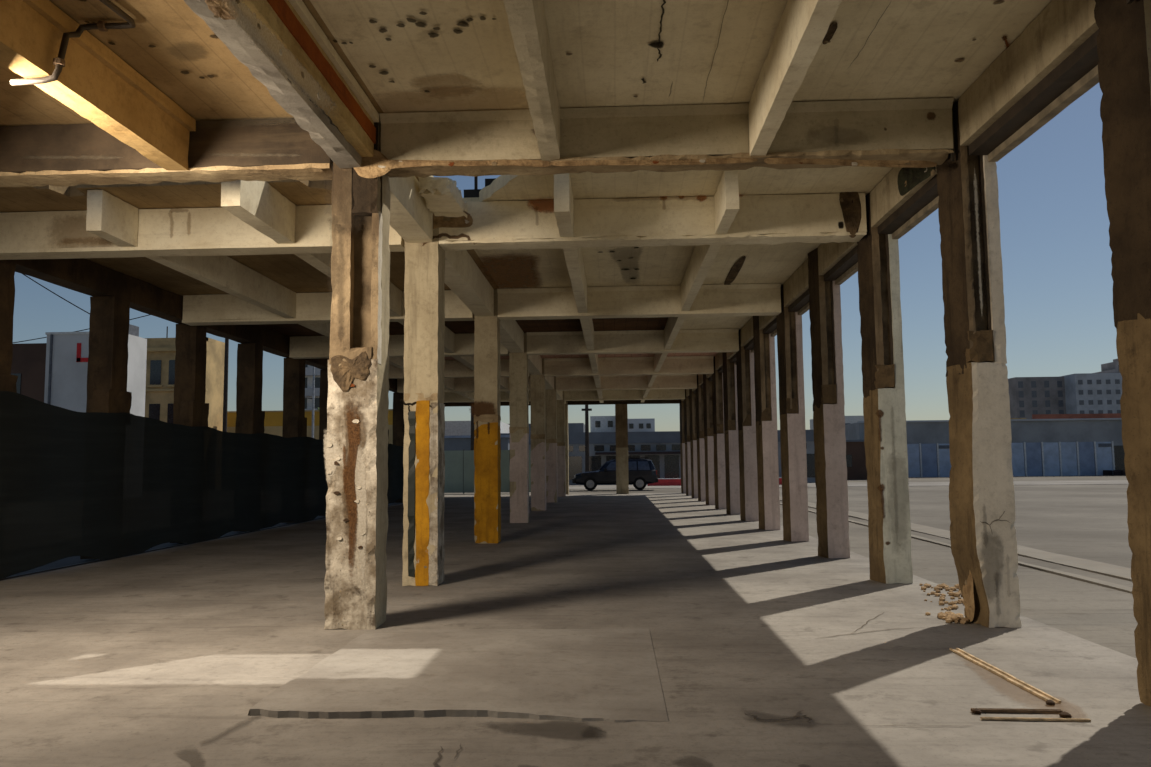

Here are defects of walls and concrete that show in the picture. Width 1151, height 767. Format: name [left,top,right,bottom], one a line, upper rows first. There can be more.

damp [369,11,496,41]
crack [641,0,673,96]